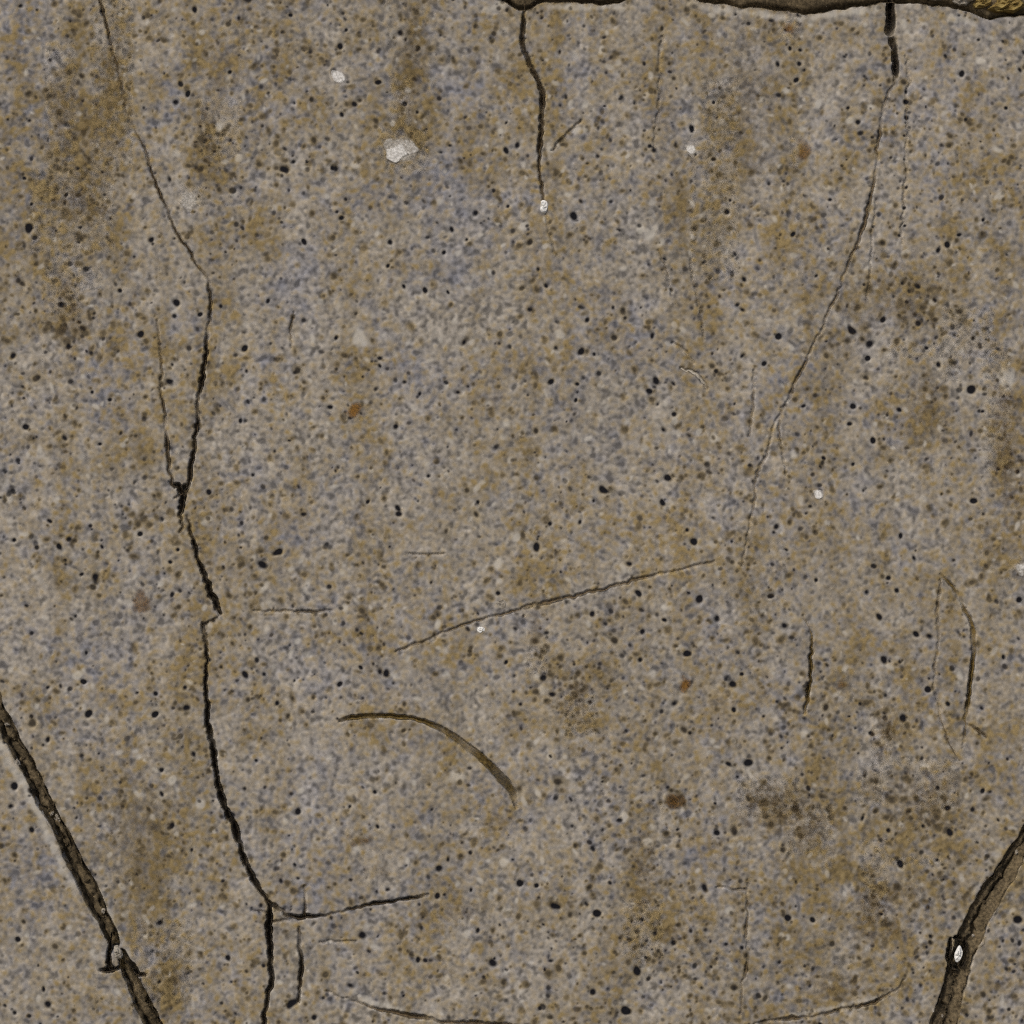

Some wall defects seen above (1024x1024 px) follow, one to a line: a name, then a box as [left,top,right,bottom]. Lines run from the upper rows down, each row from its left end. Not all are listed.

crack [99,0,122,88]
crack [521,6,548,214]
crack [885,0,899,101]
crack [826,128,881,317]
crack [792,342,815,390]
crack [136,133,423,1024]
crack [446,576,649,633]
crack [0,693,163,1024]
crack [360,1003,509,1024]
crack [928,827,1024,1024]